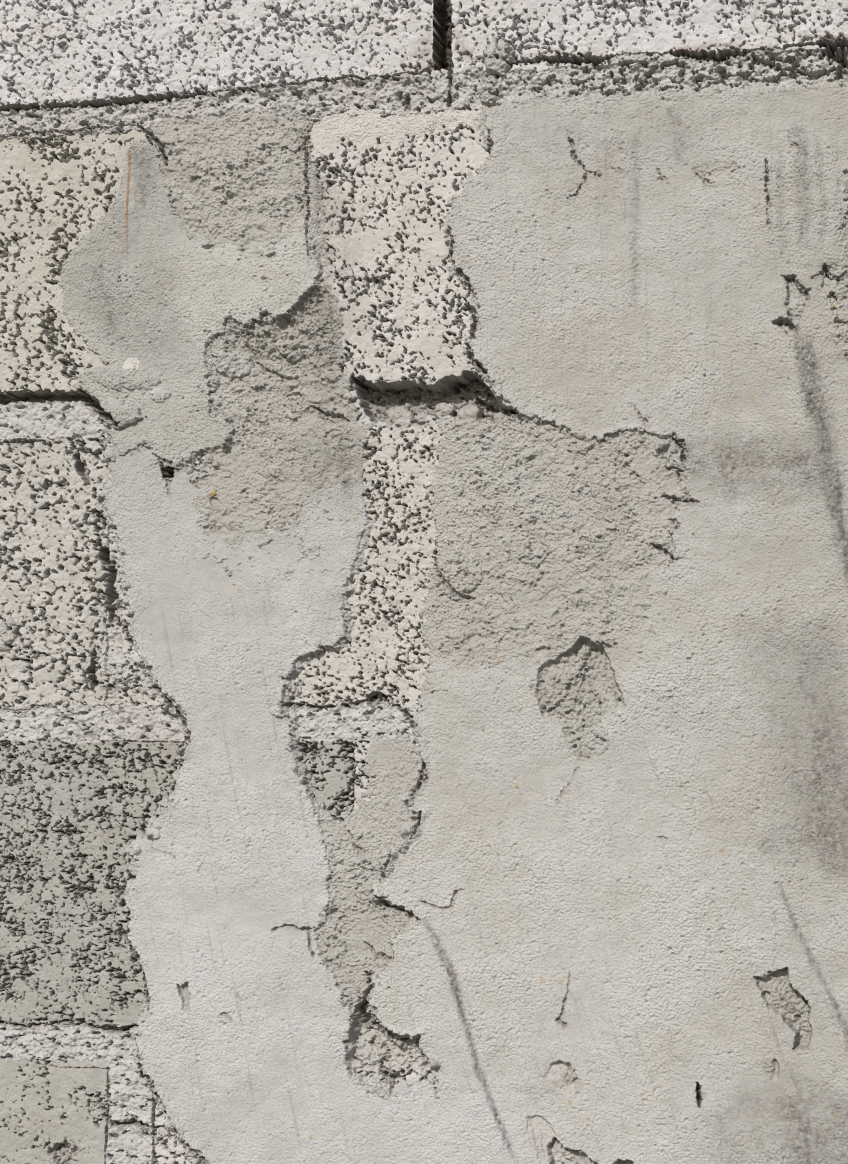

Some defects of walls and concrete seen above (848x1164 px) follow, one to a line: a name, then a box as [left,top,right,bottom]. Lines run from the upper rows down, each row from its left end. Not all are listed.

crack [566,129,626,199]
crack [653,165,672,186]
spalling [219,270,345,383]
peeling [131,636,199,764]
spalling [534,635,626,764]
peeling [274,602,432,924]
crack [270,923,317,958]
spalling [177,982,191,1012]
spalling [347,941,442,1104]
spalling [753,967,813,1051]
spalling [47,1137,87,1164]
spalling [526,1114,599,1164]